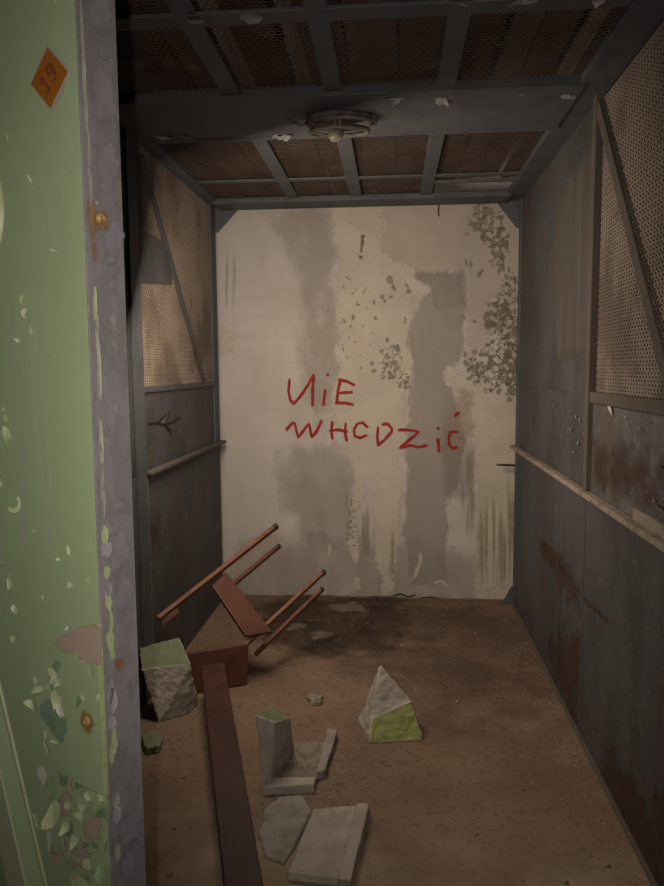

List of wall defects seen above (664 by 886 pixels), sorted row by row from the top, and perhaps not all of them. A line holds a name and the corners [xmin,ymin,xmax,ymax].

peeling [80,0,120,208]
peeling [104,221,124,291]
damp [370,204,518,588]
peeling [32,766,144,886]